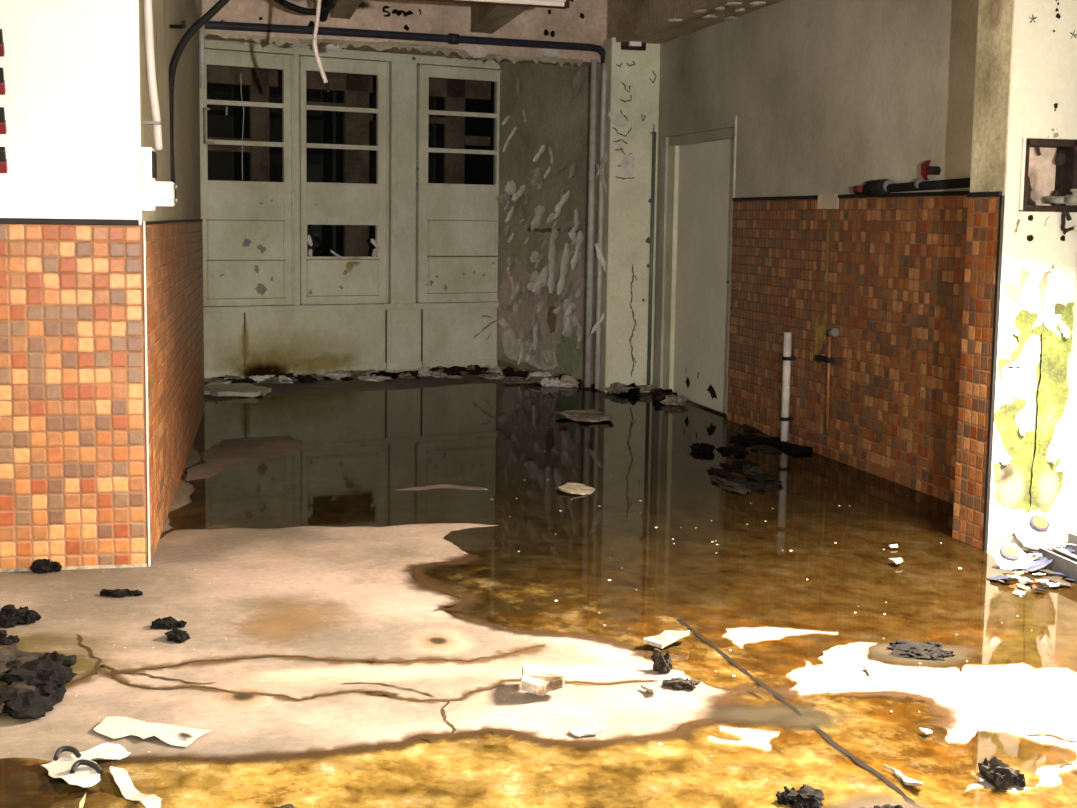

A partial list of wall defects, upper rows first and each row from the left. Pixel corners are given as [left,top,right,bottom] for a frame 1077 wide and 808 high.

water stain [667,1,766,22]
peeling [501,109,526,152]
peeling [463,145,606,379]
corrosion [243,330,295,378]
crack [1007,325,1042,507]
peeling [994,264,1074,513]
crack [65,634,546,732]
crack [564,678,659,686]